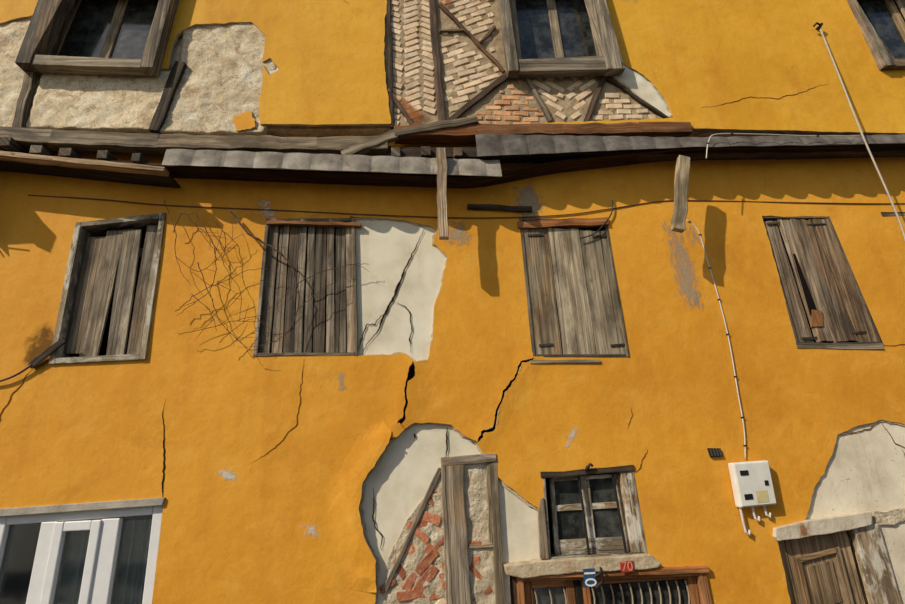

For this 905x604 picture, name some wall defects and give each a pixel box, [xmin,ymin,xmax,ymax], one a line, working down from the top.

flaking render [0,18,31,127]
flaking render [26,23,279,136]
flaking render [384,0,673,131]
crack [358,230,424,438]
flaking render [350,217,447,365]
crack [0,369,32,420]
crack [159,403,167,497]
crack [255,364,304,461]
crack [478,359,533,441]
flaking render [360,423,541,604]
flaking render [806,420,905,604]